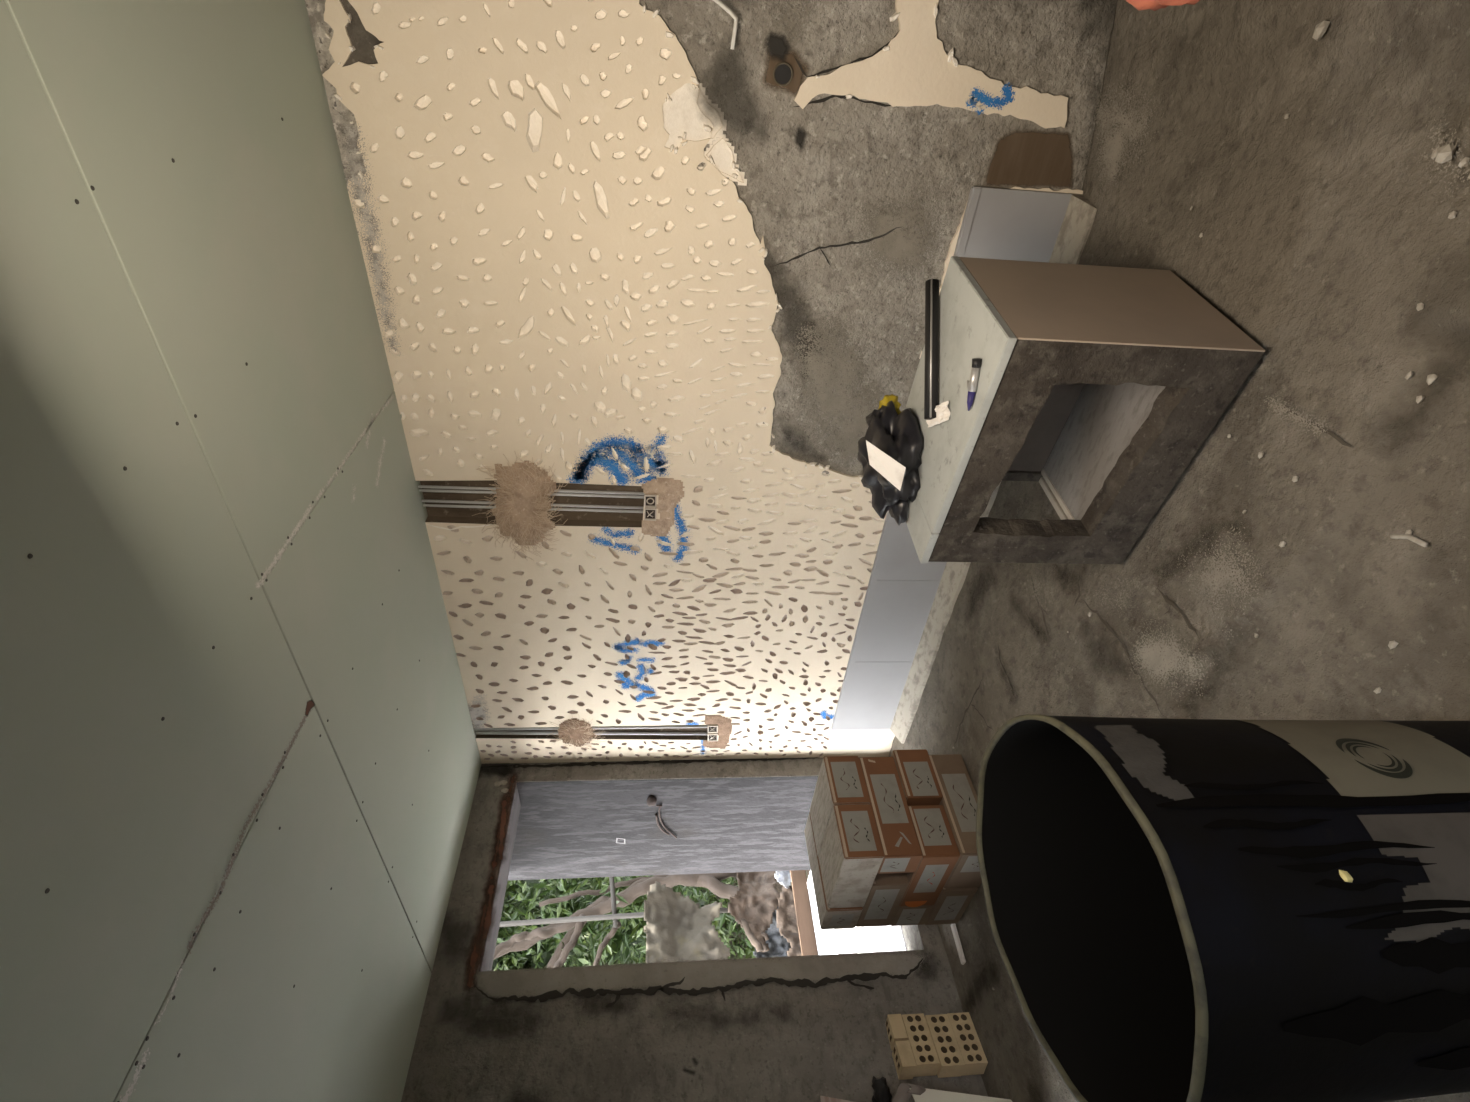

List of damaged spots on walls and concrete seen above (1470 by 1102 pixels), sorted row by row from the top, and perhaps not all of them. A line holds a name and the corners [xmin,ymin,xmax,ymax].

crack [771,227,901,268]
spalling [305,0,1112,760]
crack [474,958,923,1007]